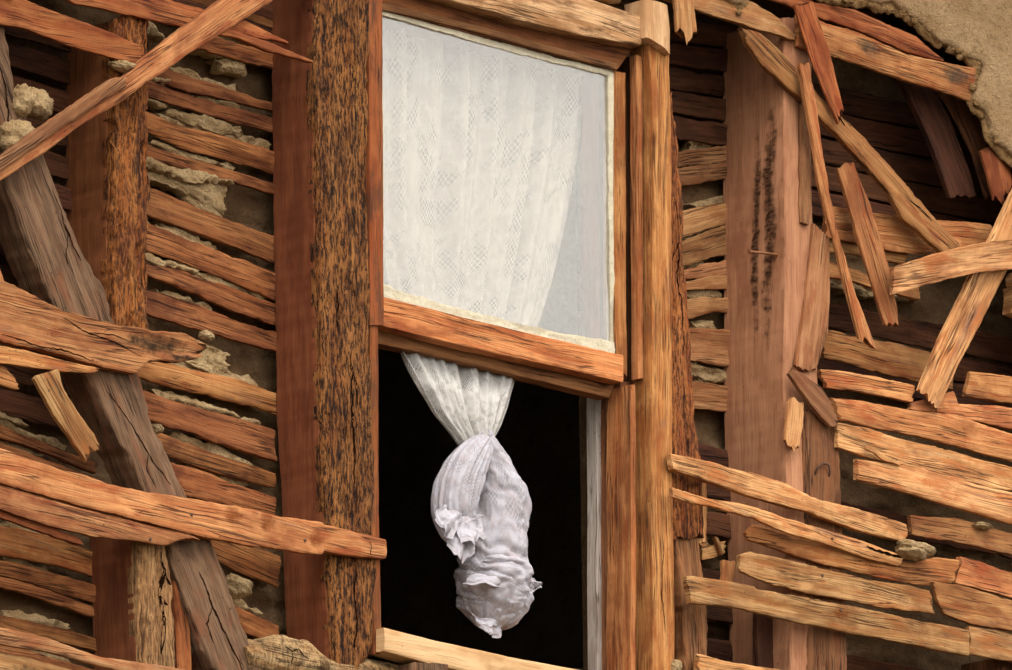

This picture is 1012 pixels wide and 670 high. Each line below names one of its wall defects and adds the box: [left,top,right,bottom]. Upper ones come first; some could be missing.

flaking render [816,0,1012,169]
crack [106,390,171,485]